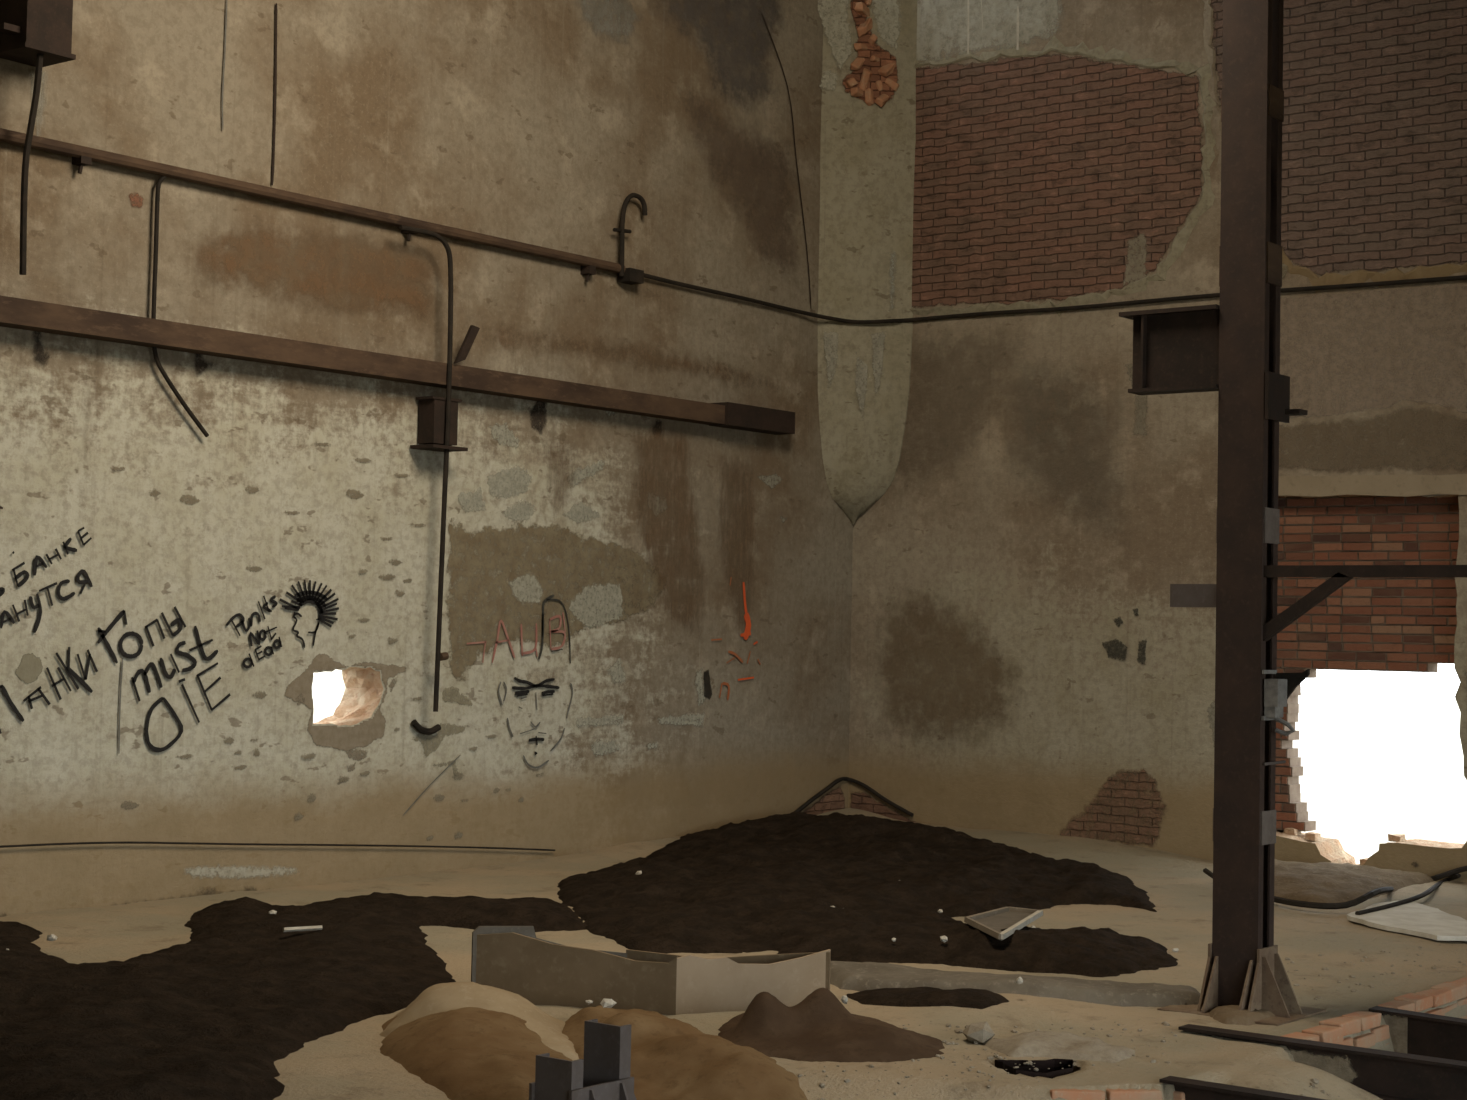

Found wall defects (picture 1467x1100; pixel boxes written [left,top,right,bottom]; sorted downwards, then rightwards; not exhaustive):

flaking render [818,0,1223,317]
flaking render [1280,0,1467,418]
peeling [492,401,547,447]
peeling [180,495,199,505]
peeling [347,489,364,499]
peeling [359,559,412,596]
peeling [442,461,667,706]
flaking render [284,654,465,784]
peeling [658,669,712,727]
peeling [224,737,259,770]
flaking render [1060,769,1166,846]